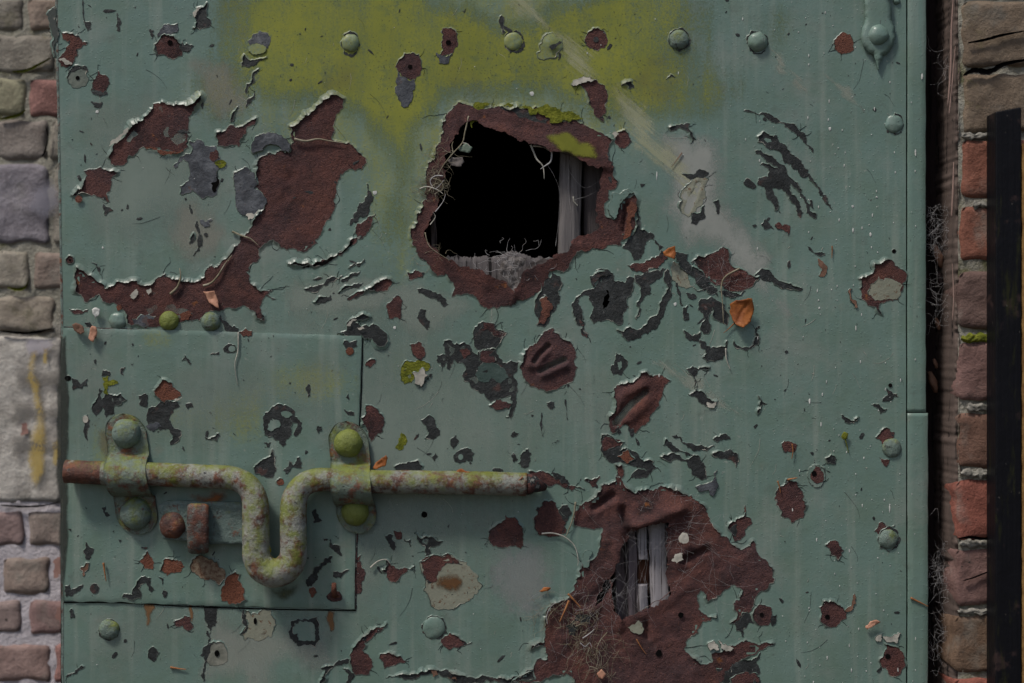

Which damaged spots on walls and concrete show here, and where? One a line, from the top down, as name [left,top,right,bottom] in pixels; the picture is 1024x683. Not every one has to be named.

peeling [743,109,832,235]
peeling [69,89,376,355]
peeling [808,246,828,277]
peeling [400,206,803,497]
peeling [380,530,483,610]
rust [437,577,462,590]
rust [750,599,777,630]